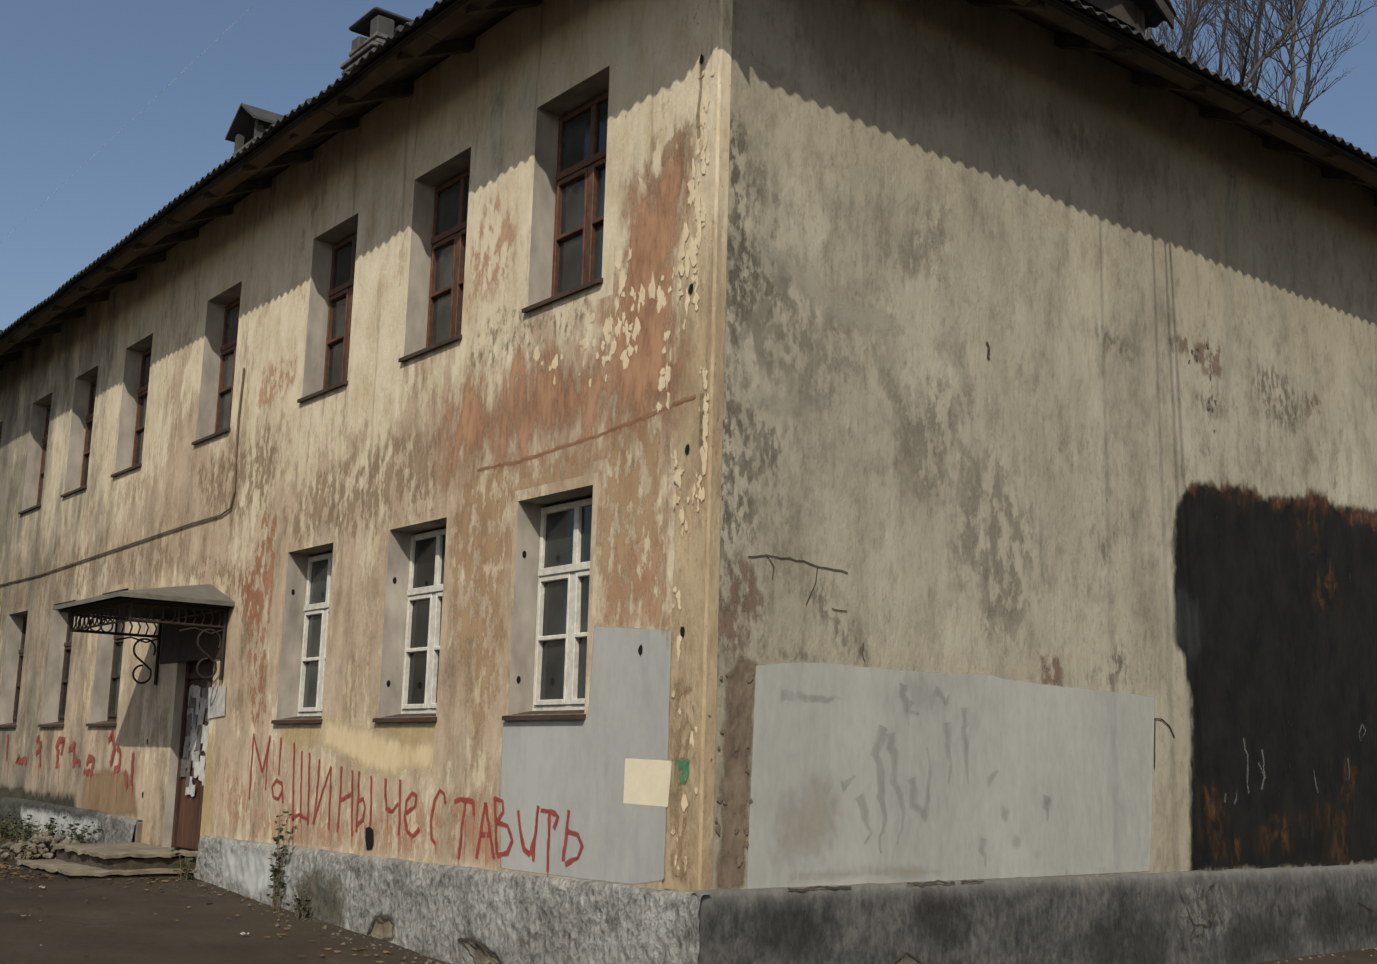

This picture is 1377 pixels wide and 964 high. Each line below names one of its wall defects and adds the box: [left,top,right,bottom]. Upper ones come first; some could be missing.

peeling [439,63,714,538]
crack [748,554,848,612]